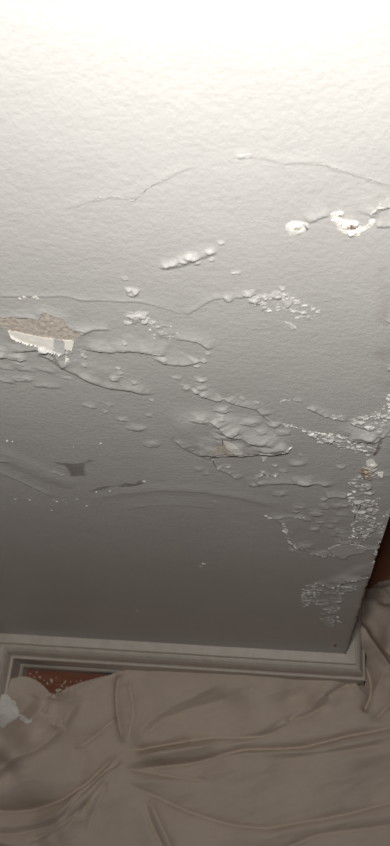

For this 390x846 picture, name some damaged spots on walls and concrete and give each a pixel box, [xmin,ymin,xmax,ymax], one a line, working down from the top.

spalling [286,221,309,237]
peeling [0,304,110,368]
spalling [349,392,390,430]
spalling [263,430,390,627]